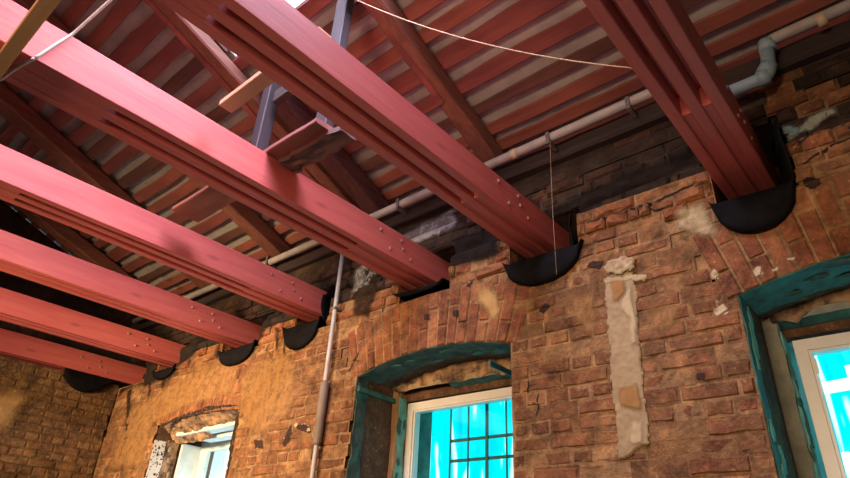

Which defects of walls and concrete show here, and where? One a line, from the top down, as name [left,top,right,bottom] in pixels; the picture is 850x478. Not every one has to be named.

crack [792,124,850,164]
crack [527,380,539,416]
spalling [282,423,311,447]
peeling [145,440,179,478]